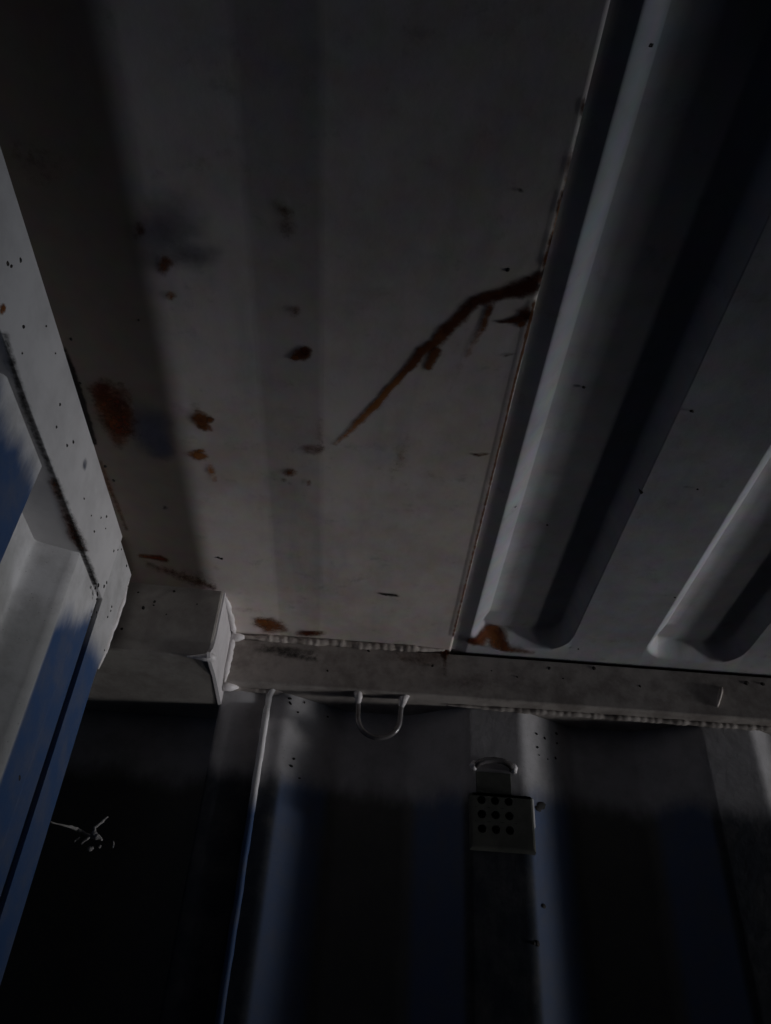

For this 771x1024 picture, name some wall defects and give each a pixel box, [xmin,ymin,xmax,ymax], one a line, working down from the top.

corrosion [291,346,312,361]
corrosion [339,263,546,441]
corrosion [192,411,214,431]
corrosion [255,619,323,636]
corrosion [467,625,534,653]